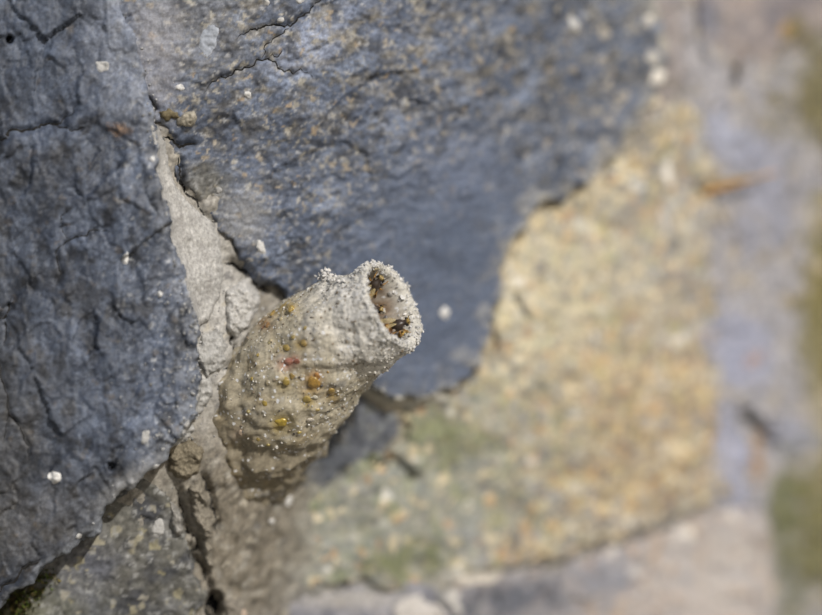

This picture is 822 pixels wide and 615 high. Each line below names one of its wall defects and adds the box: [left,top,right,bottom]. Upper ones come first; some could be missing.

crack [207,0,321,88]
crack [0,108,82,141]
crack [55,207,107,283]
crack [175,472,217,597]